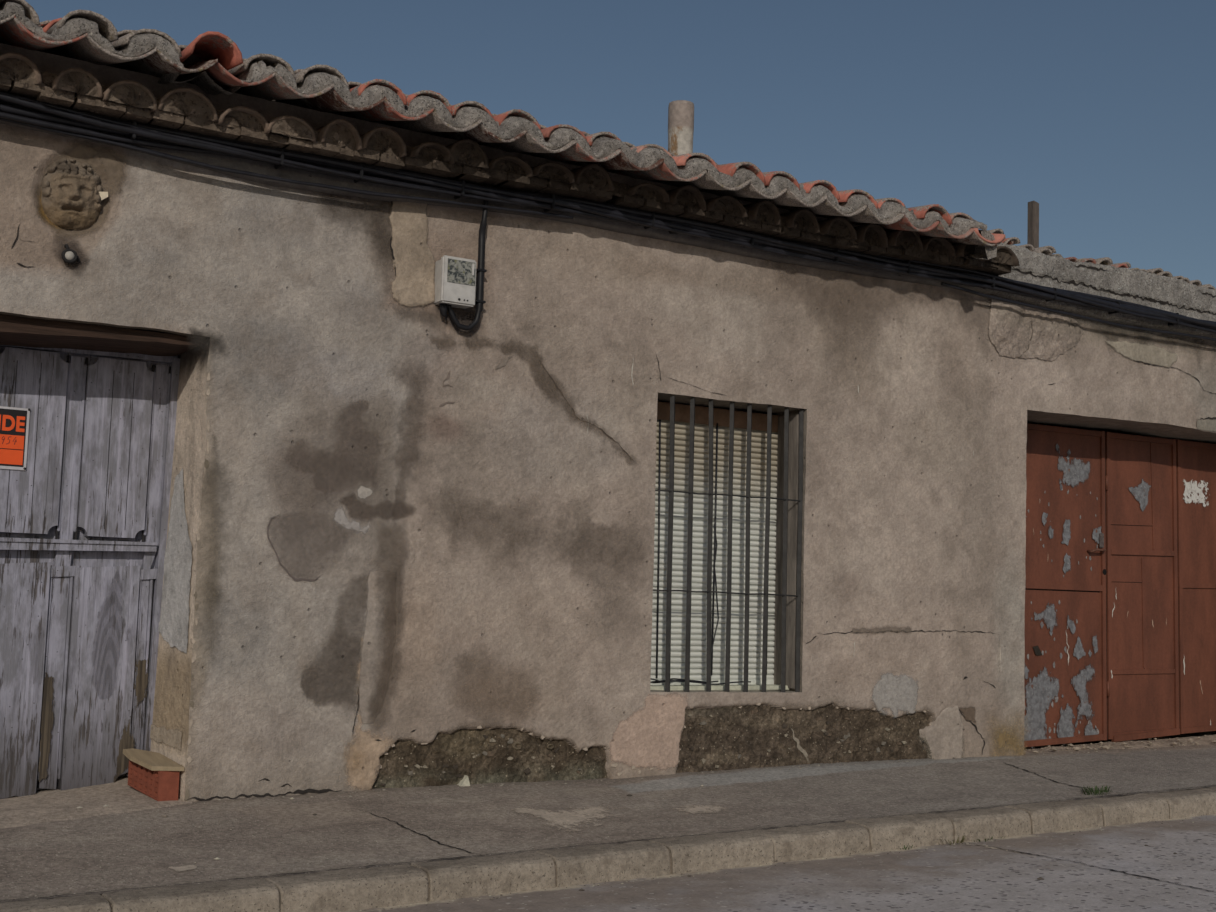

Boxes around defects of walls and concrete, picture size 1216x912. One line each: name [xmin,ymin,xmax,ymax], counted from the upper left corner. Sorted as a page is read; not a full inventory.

crack [1123,357,1216,420]
damp [267,401,413,581]
crack [806,627,992,644]
flaking render [347,710,608,790]
flaking render [676,703,935,773]